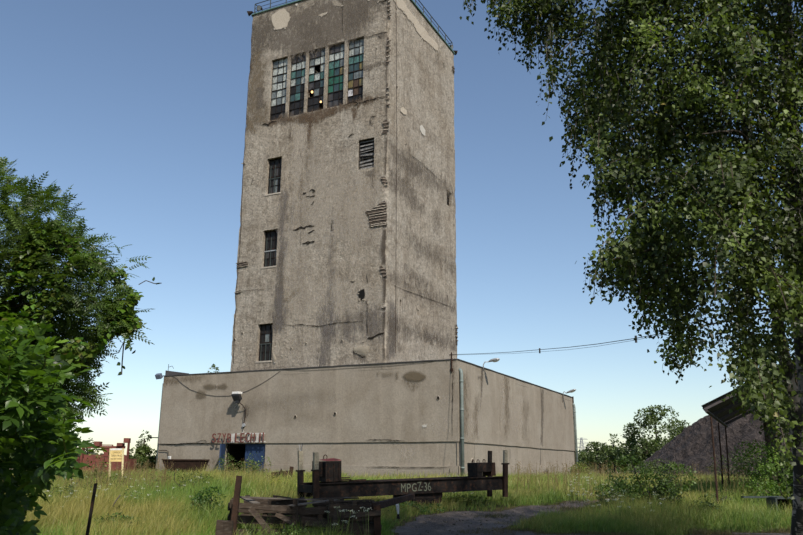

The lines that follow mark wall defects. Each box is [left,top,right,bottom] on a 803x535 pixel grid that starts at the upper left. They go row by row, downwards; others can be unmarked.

spalling [271,8,291,30]
spalling [367,0,438,51]
spalling [365,201,388,227]
water stain [272,124,456,366]
crack [284,275,385,343]
water stain [197,383,227,398]
water stain [396,371,425,388]